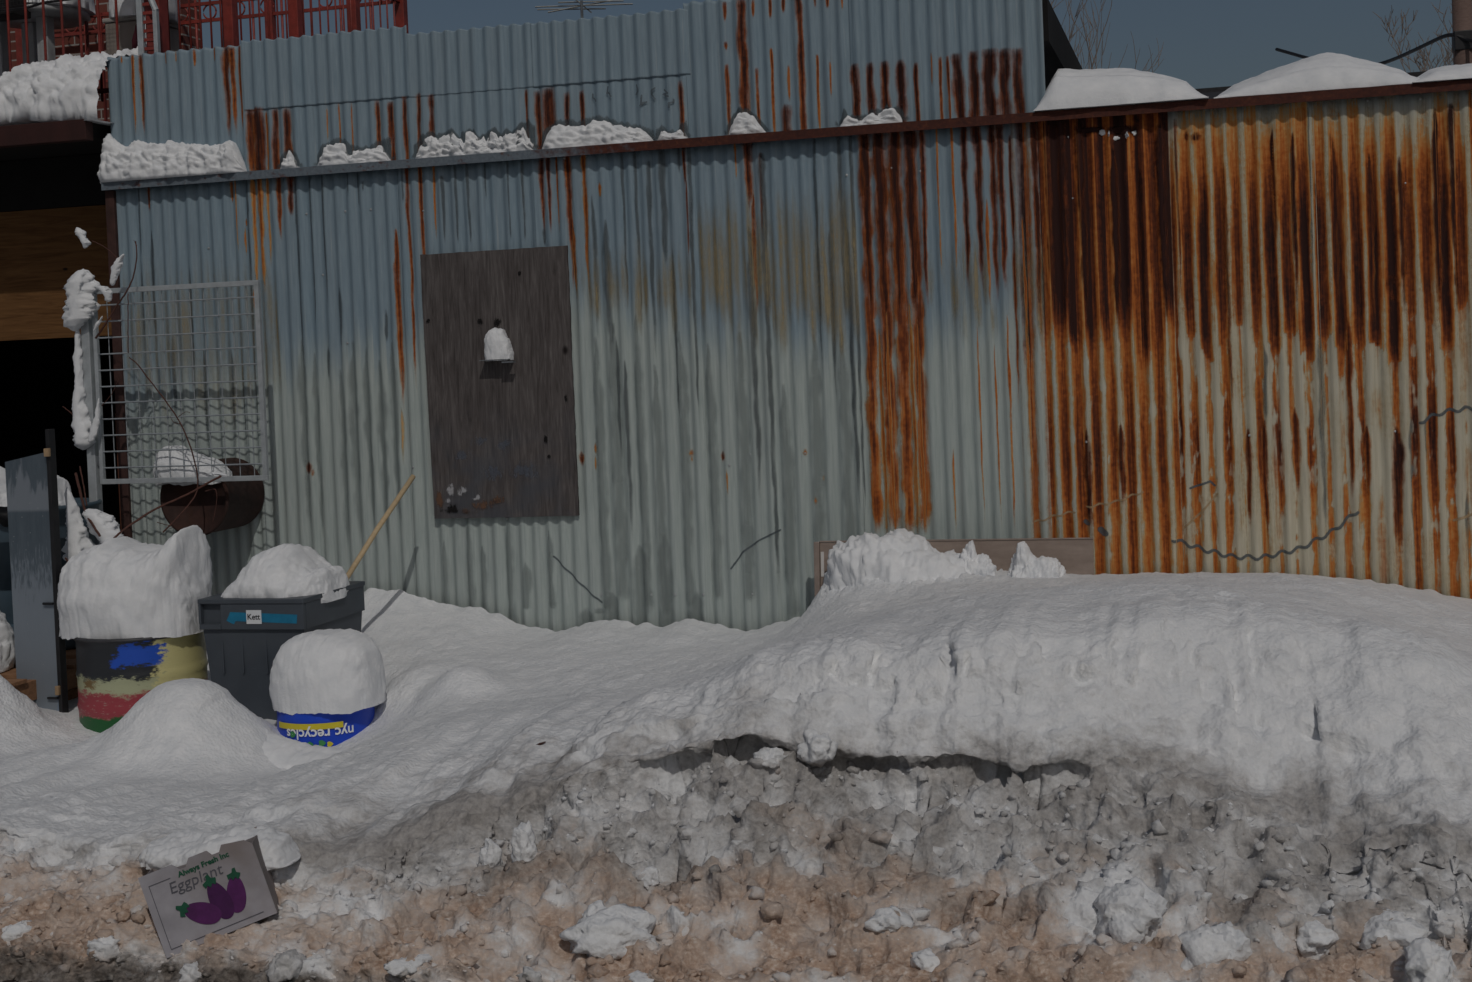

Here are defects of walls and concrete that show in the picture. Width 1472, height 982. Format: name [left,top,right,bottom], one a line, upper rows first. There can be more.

rust [121,55,145,126]
rust [214,46,293,307]
rust [375,94,437,393]
rust [525,88,601,308]
rust [682,0,1472,599]